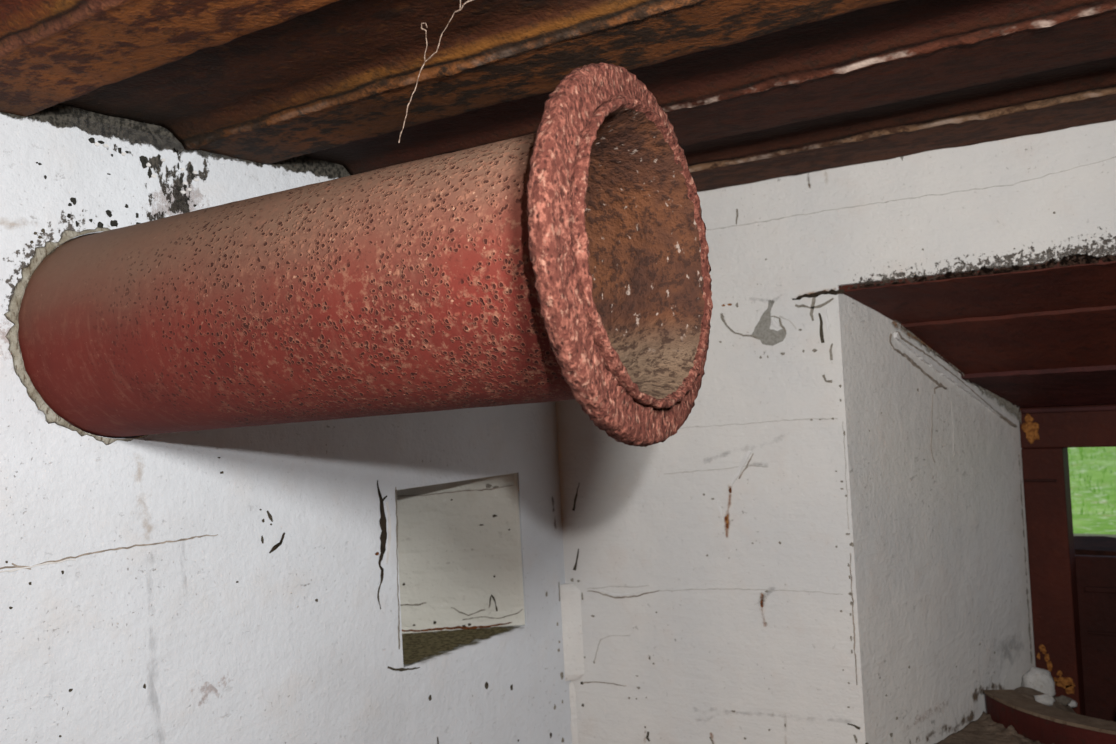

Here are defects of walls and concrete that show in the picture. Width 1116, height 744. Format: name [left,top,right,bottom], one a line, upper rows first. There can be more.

spalling [719,300,802,359]
rust [1021,413,1039,444]
rust [703,451,754,537]
crack [0,534,218,573]
crack [375,480,513,609]
rust [1037,644,1075,694]